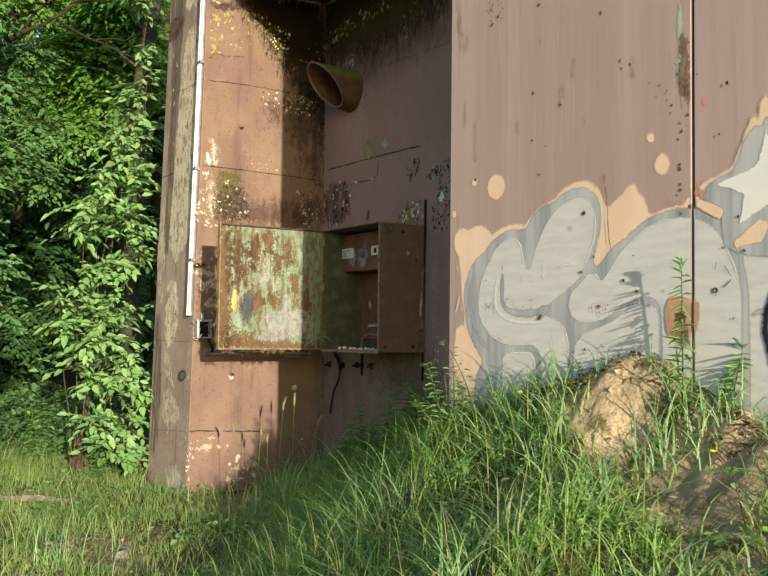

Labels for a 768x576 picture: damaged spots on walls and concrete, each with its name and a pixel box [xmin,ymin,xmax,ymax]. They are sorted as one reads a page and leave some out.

peeling [210,0,269,55]
rust [675,3,691,107]
leakage [233,0,448,229]
peeling [323,180,350,228]
peeling [398,158,451,233]
peeling [157,23,229,494]
rust [211,223,320,357]
peeling [226,454,257,485]